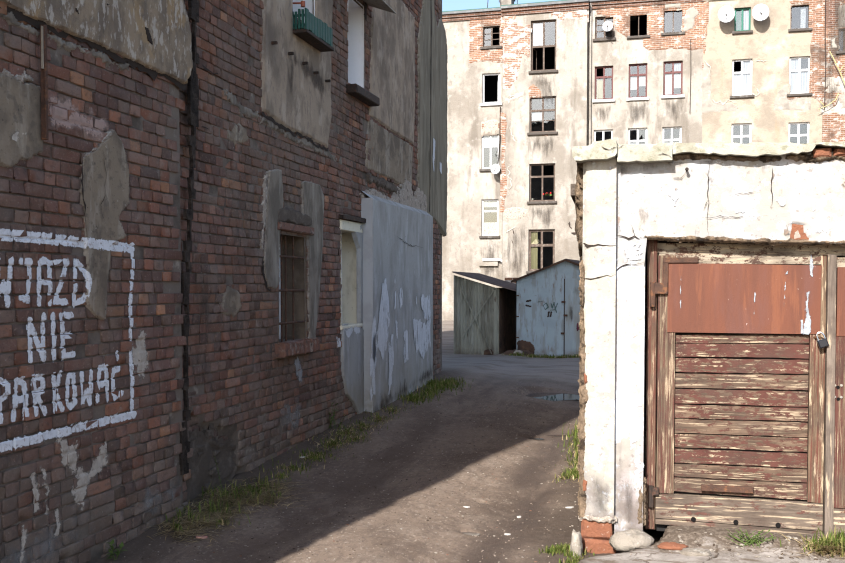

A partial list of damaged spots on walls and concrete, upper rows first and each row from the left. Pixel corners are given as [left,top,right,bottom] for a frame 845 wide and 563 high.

peeling [0,0,193,91]
flaking render [469,15,543,103]
flaking render [551,1,738,113]
flaking render [774,0,845,116]
peeling [0,68,43,168]
peeling [78,129,130,320]
crack [179,0,218,475]
peeling [365,0,448,237]
spalling [622,223,845,260]
crack [703,169,773,230]
spalling [672,147,845,163]
peeling [801,292,811,335]